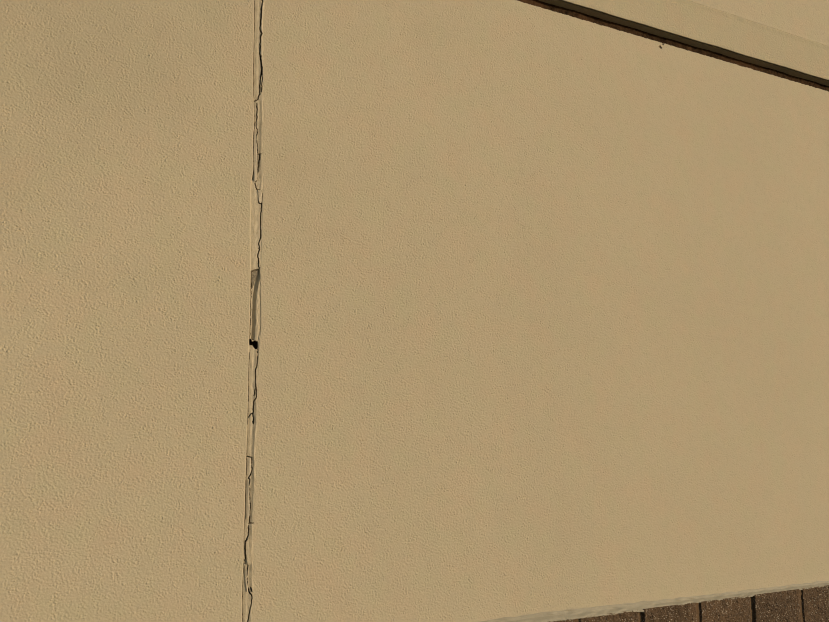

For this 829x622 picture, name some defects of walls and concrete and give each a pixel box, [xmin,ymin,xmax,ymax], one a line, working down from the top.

crack [253,0,263,101]
crack [252,122,262,267]